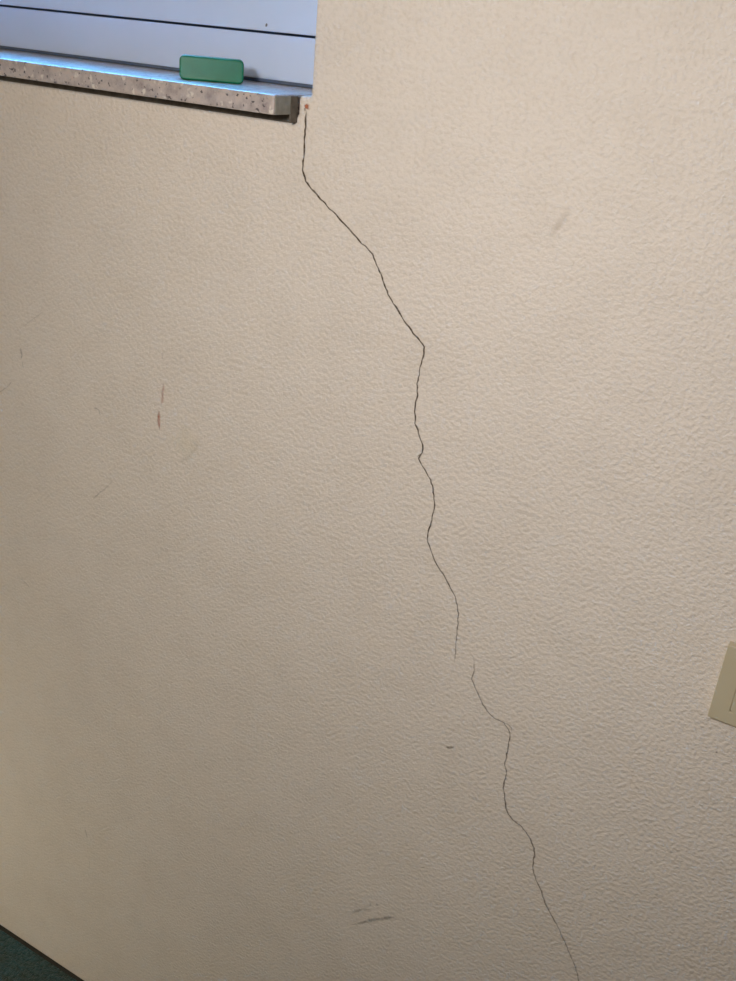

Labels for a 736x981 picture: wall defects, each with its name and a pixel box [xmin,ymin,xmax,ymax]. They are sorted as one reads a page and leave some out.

crack [302,115,459,640]
crack [472,675,572,959]